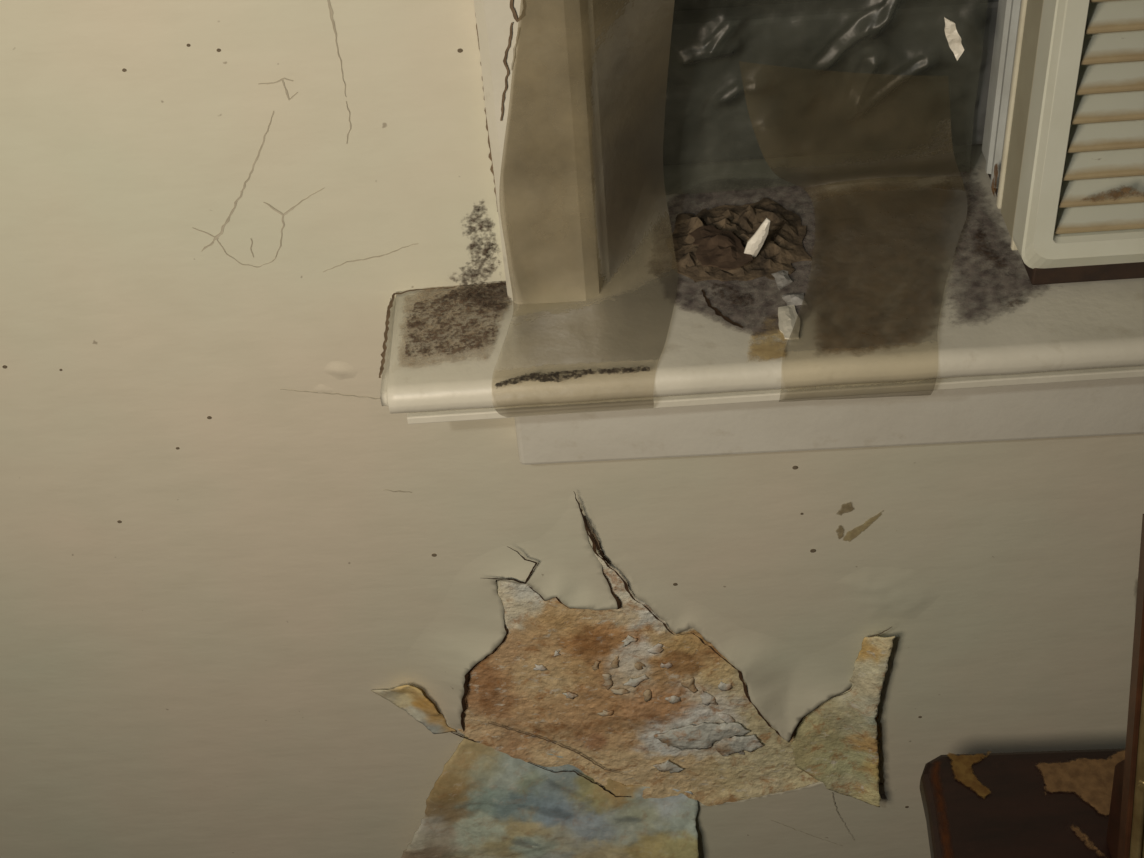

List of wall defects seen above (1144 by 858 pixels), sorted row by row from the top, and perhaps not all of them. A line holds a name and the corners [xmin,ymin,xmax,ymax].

crack [327,0,351,144]
crack [323,243,418,272]
water stain [402,202,510,365]
water stain [650,174,830,335]
water stain [943,170,1047,321]
peeling [371,491,895,858]